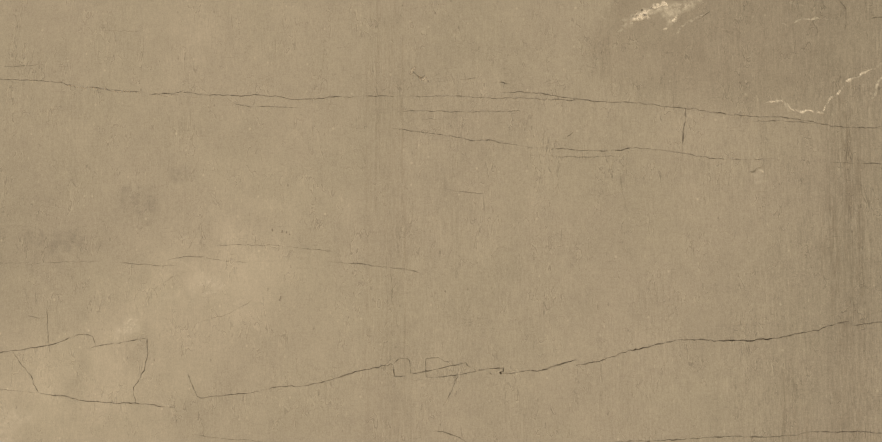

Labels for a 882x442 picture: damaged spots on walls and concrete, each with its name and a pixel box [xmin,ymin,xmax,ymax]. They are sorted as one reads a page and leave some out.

damp [582,0,882,442]